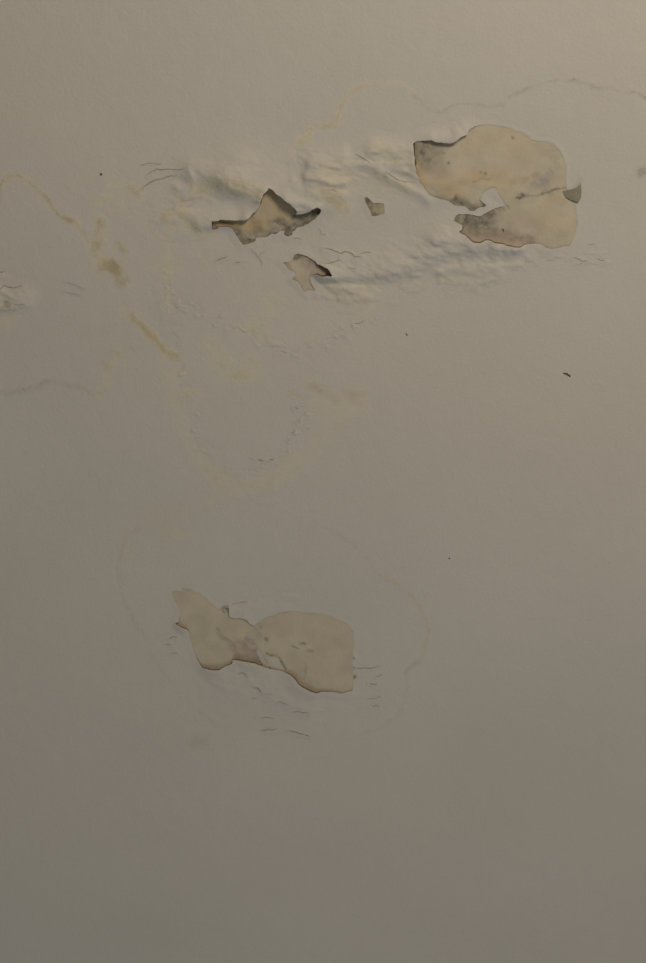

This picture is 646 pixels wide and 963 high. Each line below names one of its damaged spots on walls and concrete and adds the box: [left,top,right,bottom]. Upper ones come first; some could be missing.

peeling [212,188,332,298]
peeling [362,193,389,222]
peeling [409,114,583,261]
peeling [166,585,360,704]